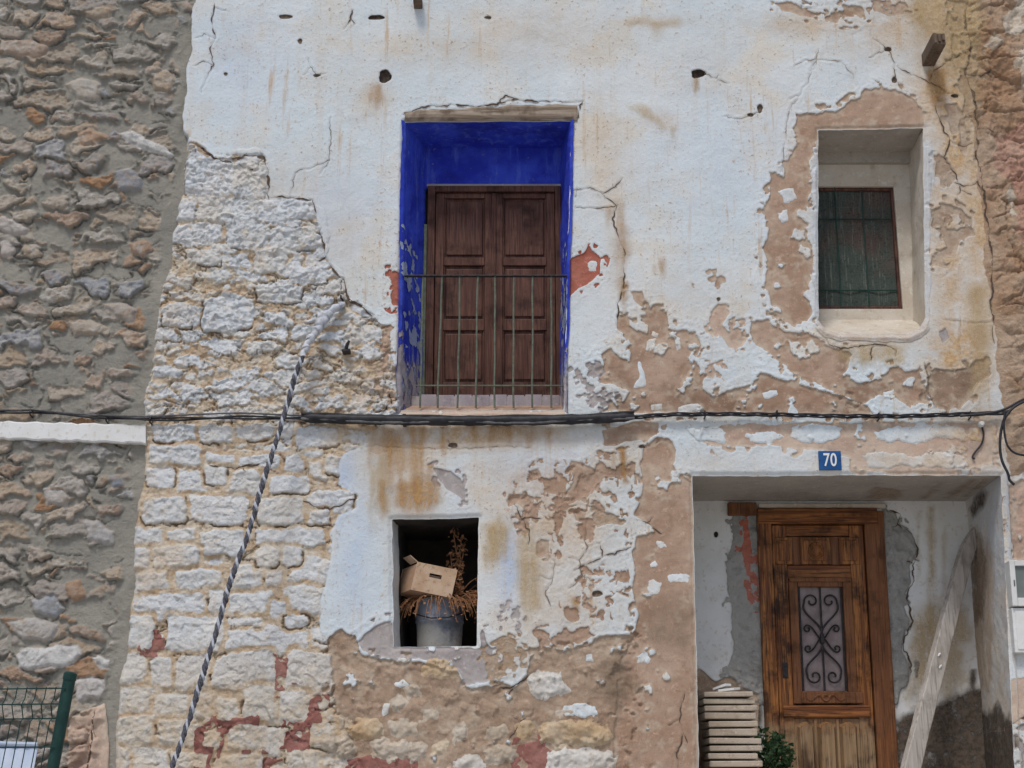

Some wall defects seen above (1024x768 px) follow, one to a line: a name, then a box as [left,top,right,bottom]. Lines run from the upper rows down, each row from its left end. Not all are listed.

crack [198,1,215,92]
crack [194,122,387,327]
crack [573,178,626,323]
crack [782,50,854,162]
crack [870,1,995,346]
flaking render [115,77,1003,768]
water stain [952,482,985,515]
water stain [946,535,985,682]
water stain [896,713,914,768]
water stain [922,670,1017,768]